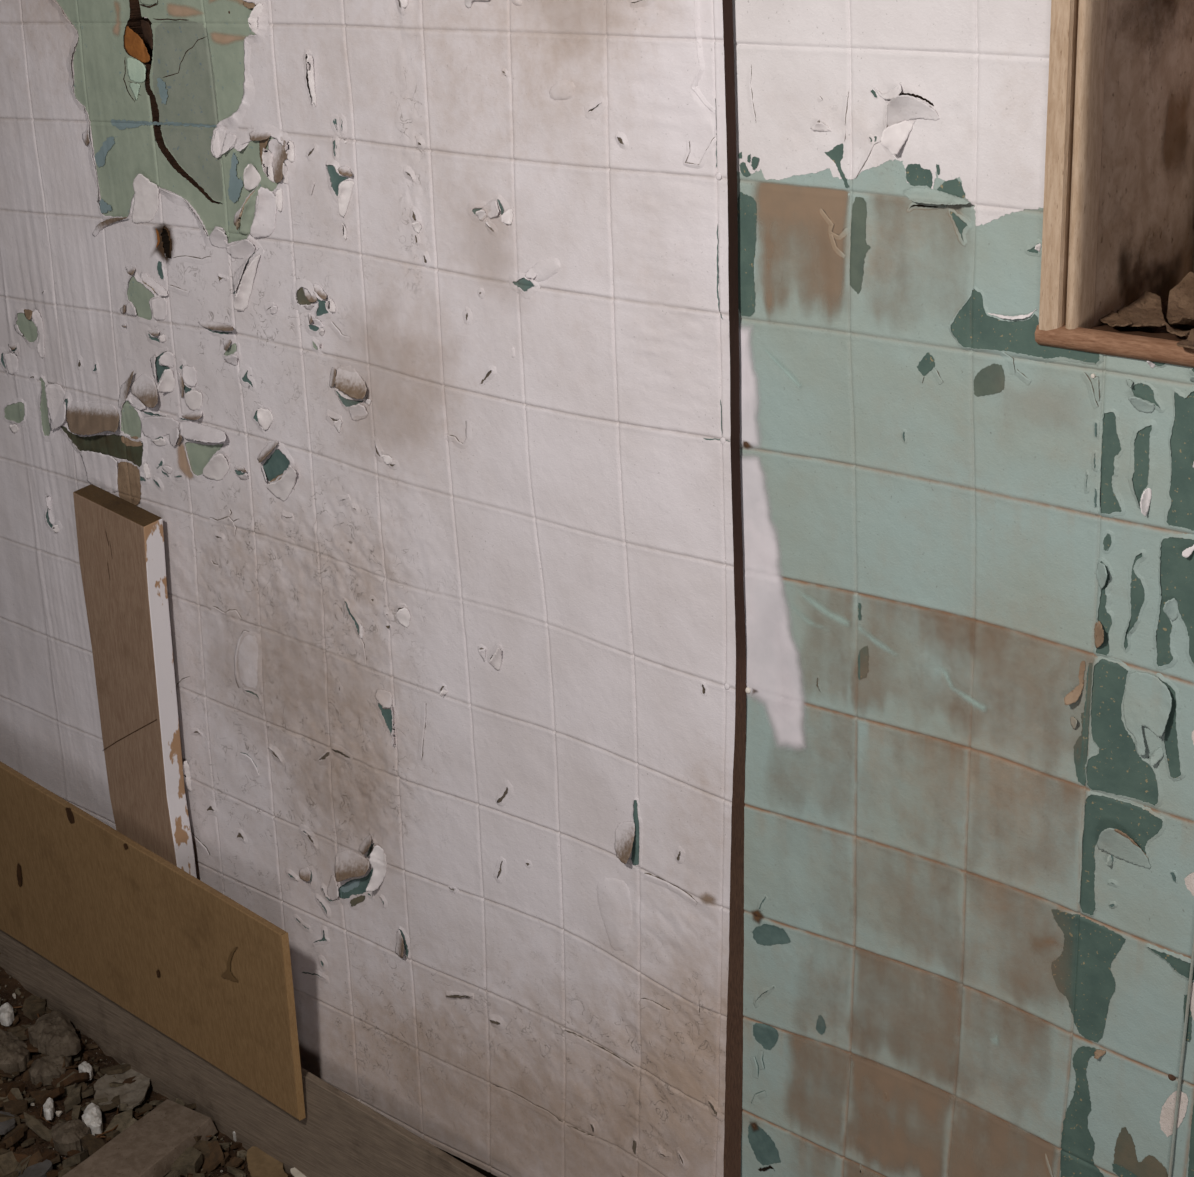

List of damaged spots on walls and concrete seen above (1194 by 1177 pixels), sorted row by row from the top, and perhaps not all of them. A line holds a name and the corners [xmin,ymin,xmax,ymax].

crack [123,0,222,204]
peeling [48,0,354,312]
peeling [290,278,336,355]
peeling [737,192,757,317]
damp [757,183,848,311]
peeling [825,143,870,294]
peeling [903,164,973,247]
peeling [0,258,297,519]
peeling [285,835,387,947]
peeling [614,797,643,869]
peeling [1051,367,1194,1177]
damp [792,1035,1055,1177]